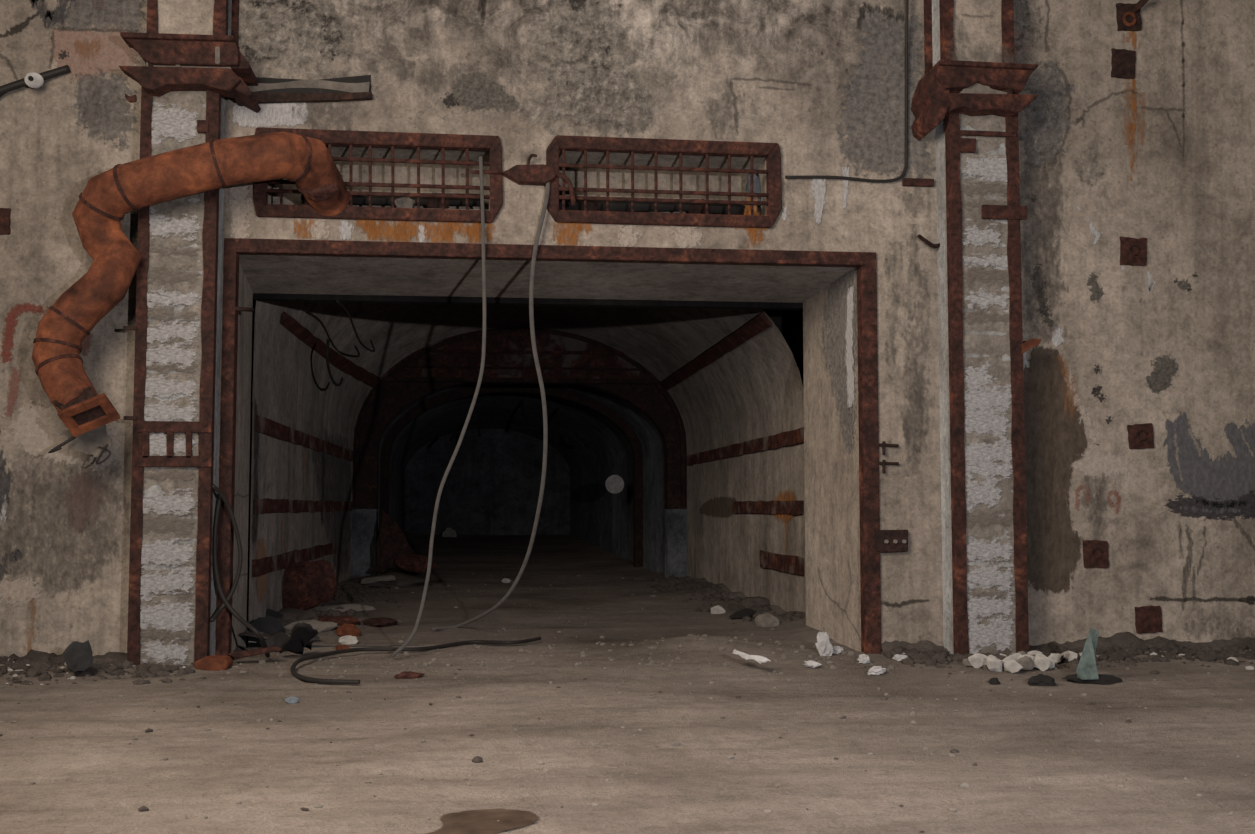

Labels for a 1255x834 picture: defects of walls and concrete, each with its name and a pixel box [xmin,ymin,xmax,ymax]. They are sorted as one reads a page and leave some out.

rust [294,219,494,243]
rust [553,223,591,246]
rust [618,225,642,247]
rust [671,227,702,248]
water stain [1023,347,1105,593]
water stain [0,466,127,590]